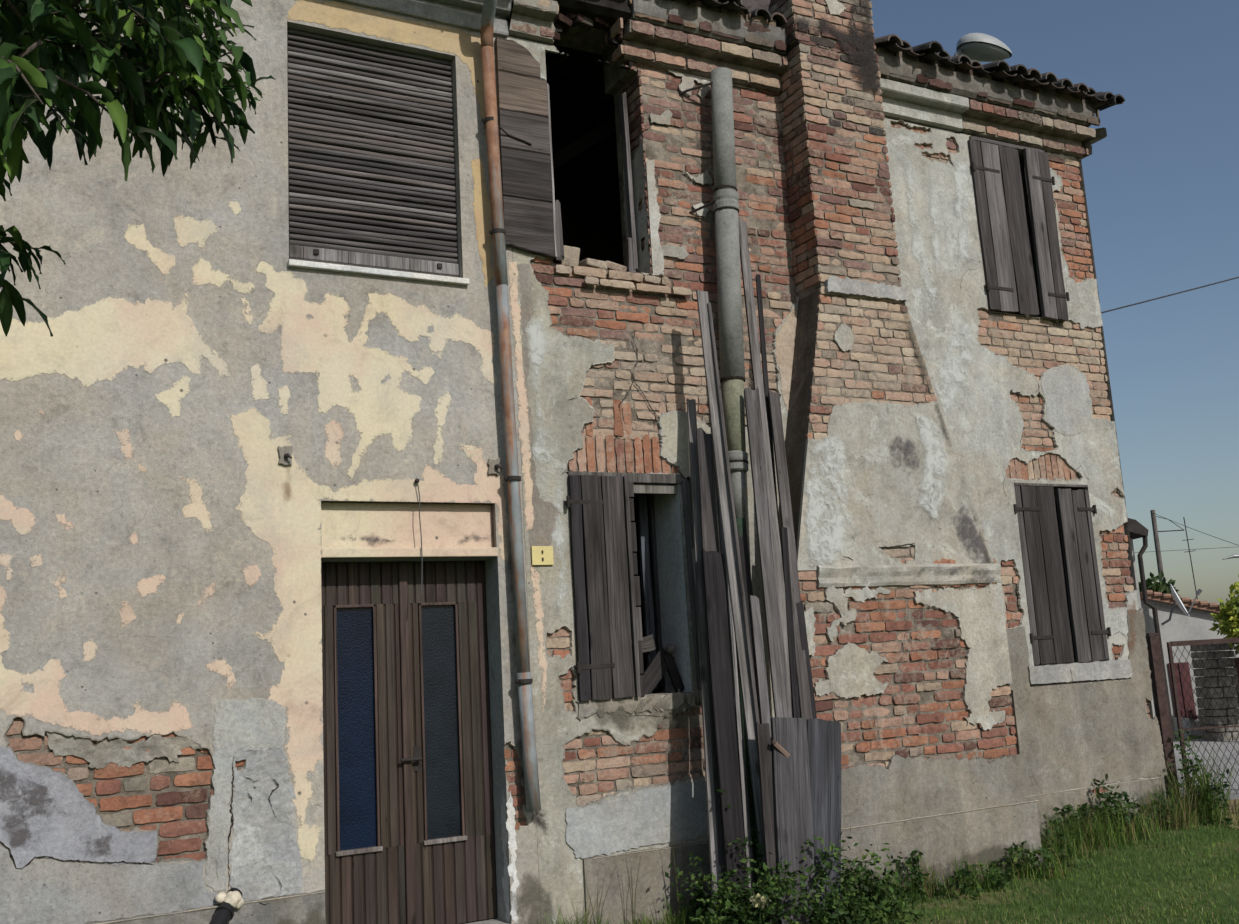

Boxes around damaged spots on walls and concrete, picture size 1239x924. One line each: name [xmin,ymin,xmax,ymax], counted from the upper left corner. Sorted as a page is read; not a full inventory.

peeling [287,0,495,140]
spalling [471,60,723,548]
spalling [732,83,798,429]
spalling [977,306,1115,482]
peeling [0,215,510,864]
spalling [1098,521,1136,610]
spalling [798,558,1025,769]
damp [0,771,52,847]
crack [0,841,152,869]
damp [88,836,110,854]
crack [217,763,279,905]
spalling [562,702,705,807]